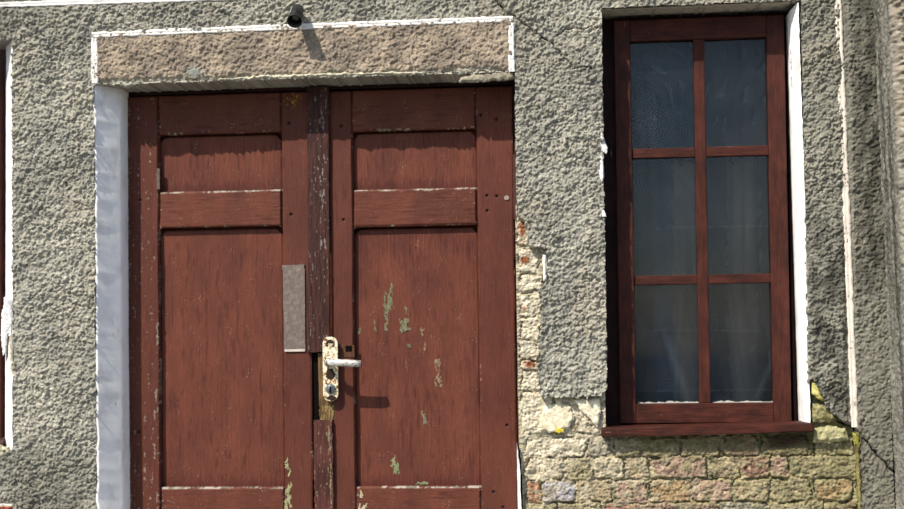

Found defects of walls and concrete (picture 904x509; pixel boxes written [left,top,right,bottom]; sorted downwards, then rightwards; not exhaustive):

crack [495,0,601,69]
peeling [599,132,608,182]
flaking render [515,210,858,509]
crack [833,419,895,473]